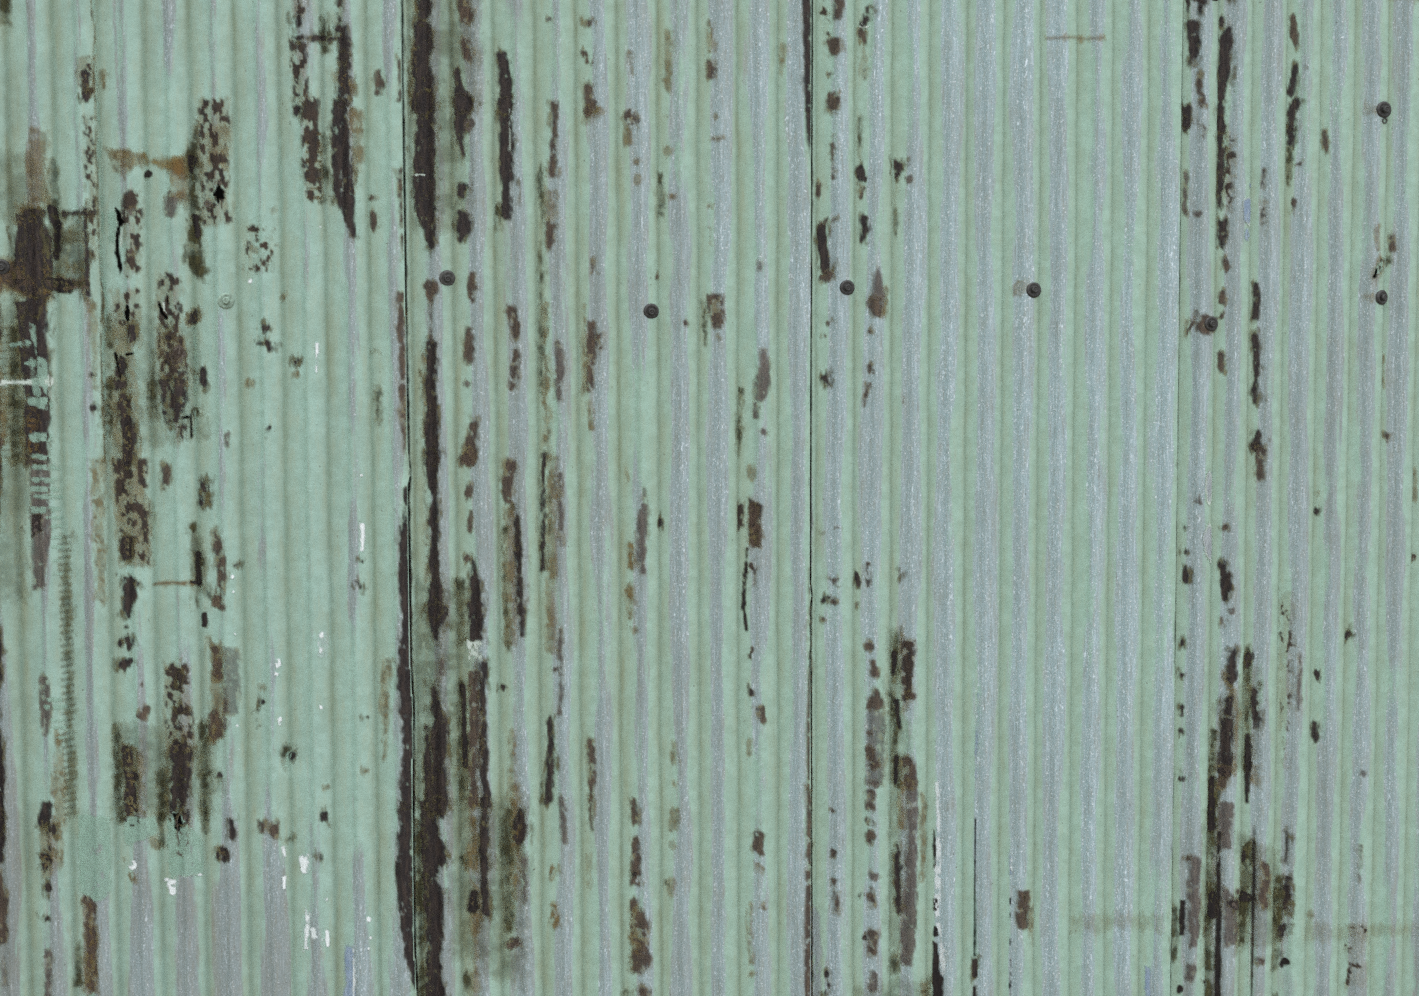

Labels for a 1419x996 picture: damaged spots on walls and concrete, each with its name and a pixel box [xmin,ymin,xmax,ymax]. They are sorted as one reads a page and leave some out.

corrosion [246,225,273,272]
corrosion [289,0,377,239]
corrosion [495,48,519,219]
corrosion [538,101,560,283]
corrosion [683,294,725,344]
corrosion [753,349,771,434]
corrosion [802,0,845,145]
corrosion [814,218,836,283]
corrosion [855,162,870,243]
corrosion [867,270,887,333]
corrosion [1182,0,1236,335]
corrosion [1286,14,1303,207]